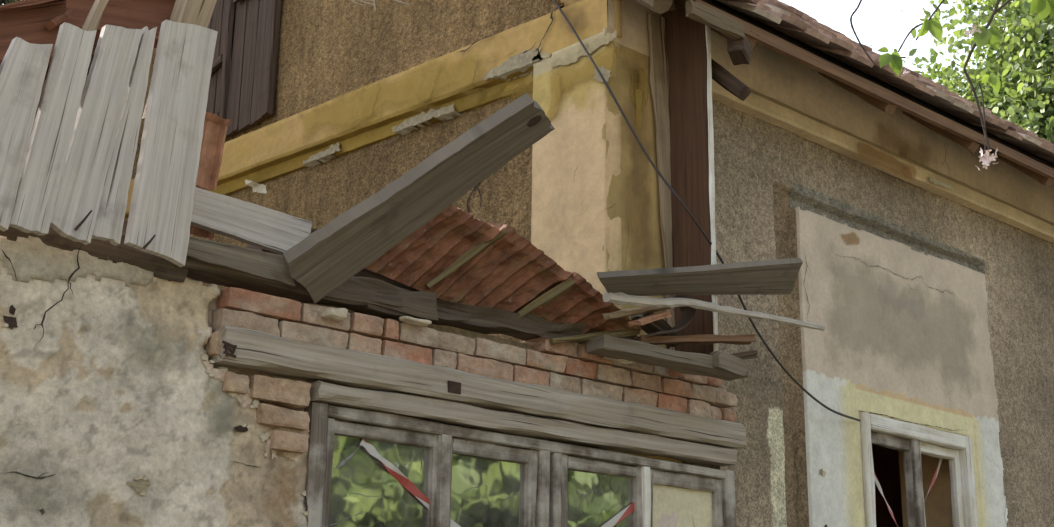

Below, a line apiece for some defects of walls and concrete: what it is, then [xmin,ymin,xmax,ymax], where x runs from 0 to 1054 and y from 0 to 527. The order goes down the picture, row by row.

flaking render [483,31,618,83]
crack [467,184,481,211]
crack [33,245,82,352]
flaking render [2,305,18,329]
flaking render [201,354,226,381]
flaking render [234,423,310,469]
flaking render [126,474,150,495]